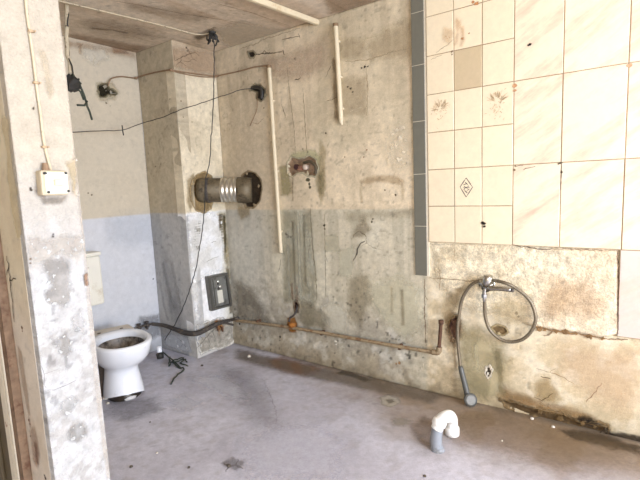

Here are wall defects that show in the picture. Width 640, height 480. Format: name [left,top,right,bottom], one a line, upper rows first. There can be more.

crack [515,245,628,340]
flaking render [498,397,610,433]